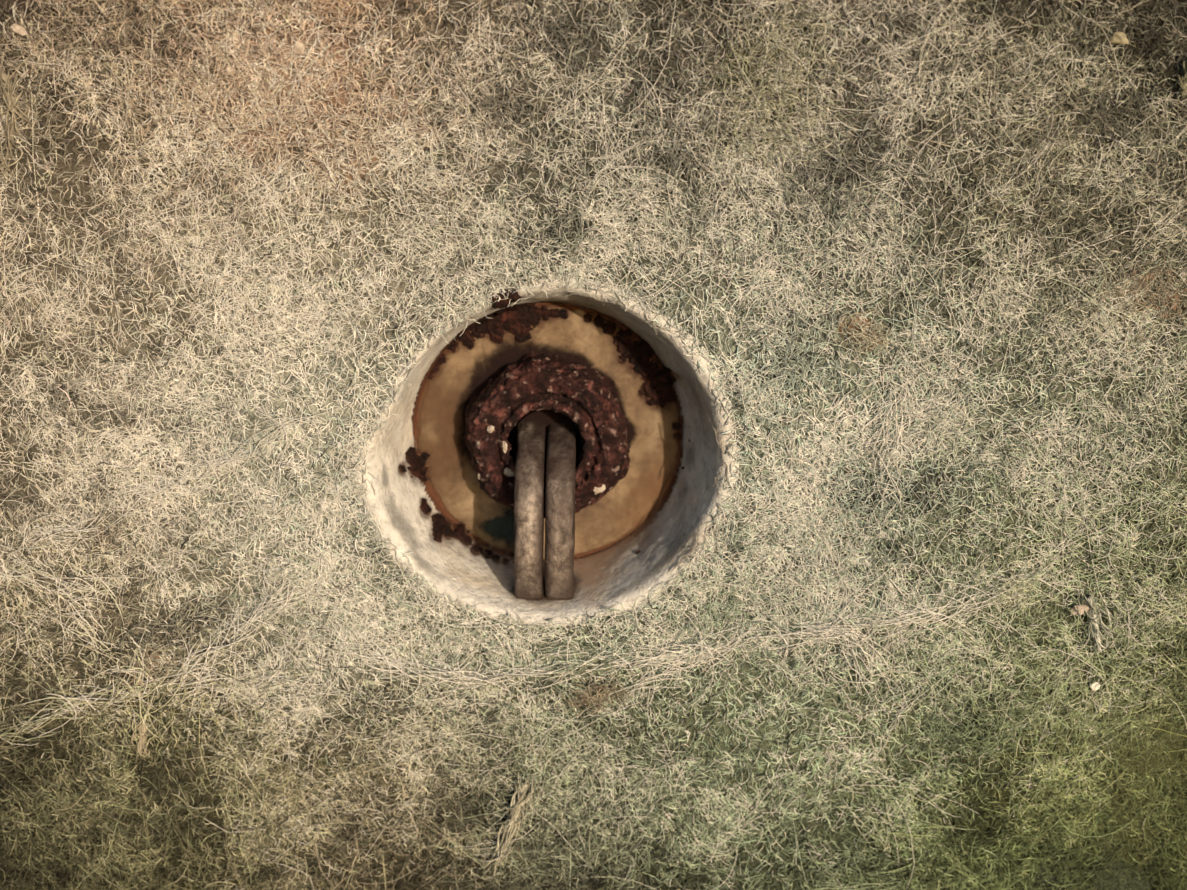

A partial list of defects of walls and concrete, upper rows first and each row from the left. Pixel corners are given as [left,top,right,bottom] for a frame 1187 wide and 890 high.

rust [398,284,690,602]